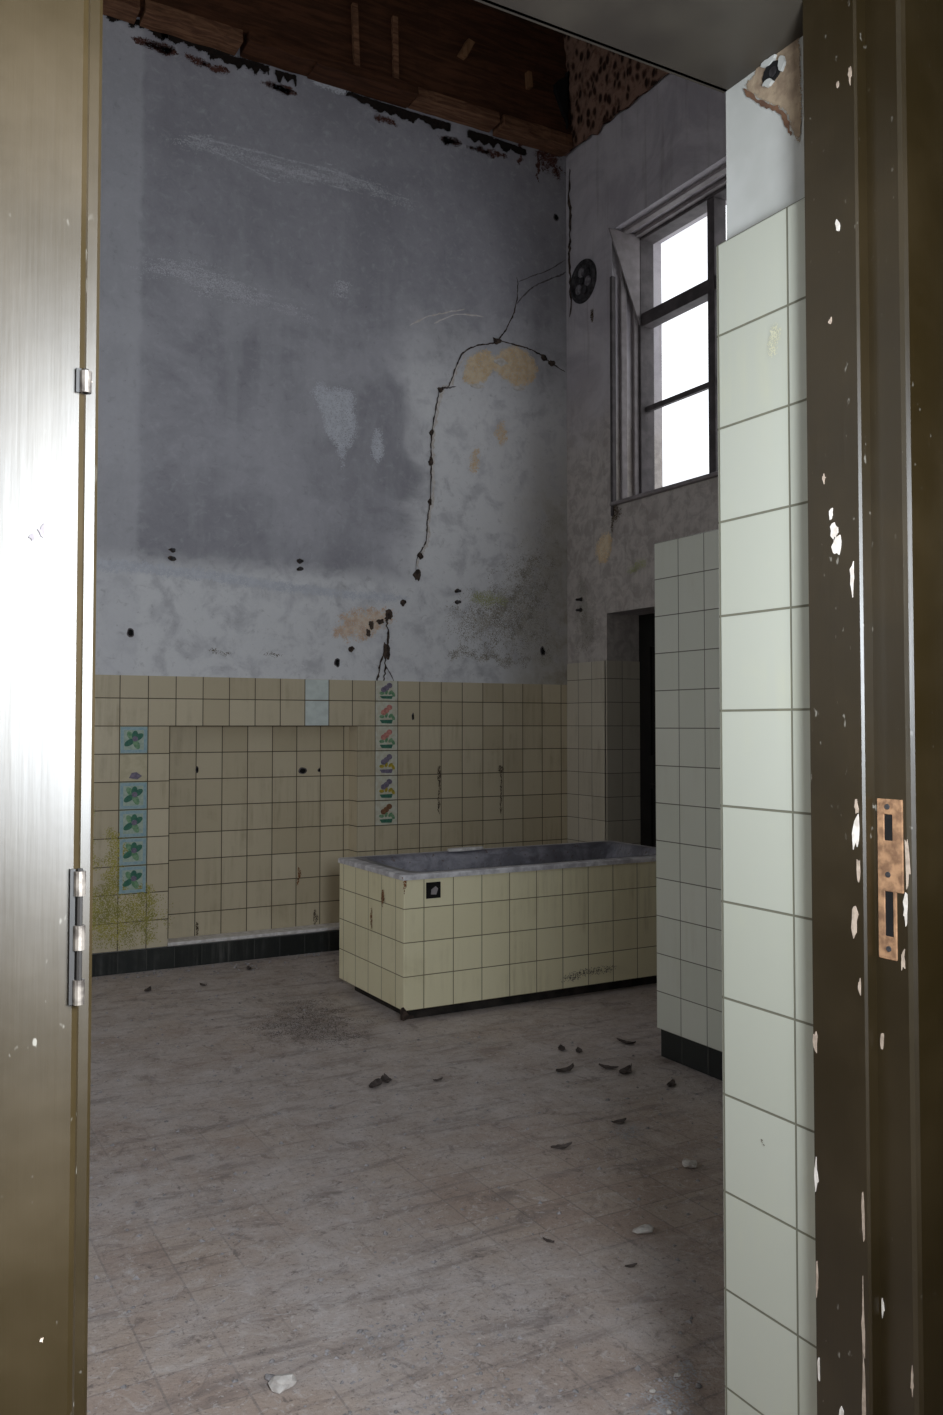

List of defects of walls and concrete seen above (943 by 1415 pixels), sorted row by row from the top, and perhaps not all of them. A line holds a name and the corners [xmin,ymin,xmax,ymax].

flaking render [105,15,528,159]
flaking render [743,38,803,143]
crack [413,169,572,581]
peeling [829,508,854,597]
flaking render [332,599,406,653]
crack [376,613,394,681]
water stain [92,827,173,951]
peeling [851,906,859,939]
peeling [852,799,860,882]
peeling [903,839,911,926]